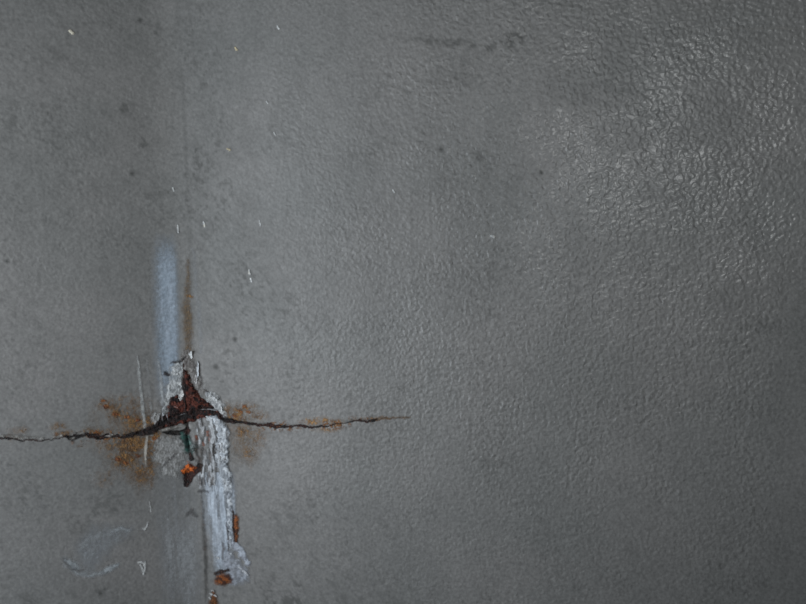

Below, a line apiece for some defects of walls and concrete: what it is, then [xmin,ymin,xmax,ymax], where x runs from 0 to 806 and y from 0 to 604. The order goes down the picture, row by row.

crack [0,414,190,442]
corrosion [86,400,165,481]
peeling [132,350,235,477]
crack [213,408,378,429]
corrosion [181,405,257,604]